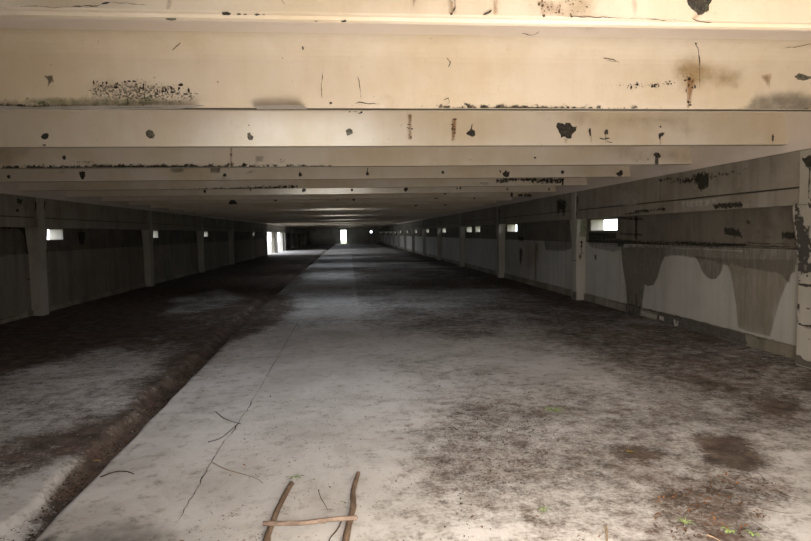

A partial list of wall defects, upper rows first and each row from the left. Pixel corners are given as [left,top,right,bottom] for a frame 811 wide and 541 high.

spalling [687,0,712,15]
water stain [90,80,198,106]
rust [682,66,701,106]
spalling [556,122,577,139]
peeling [794,199,811,287]
crack [179,313,303,519]